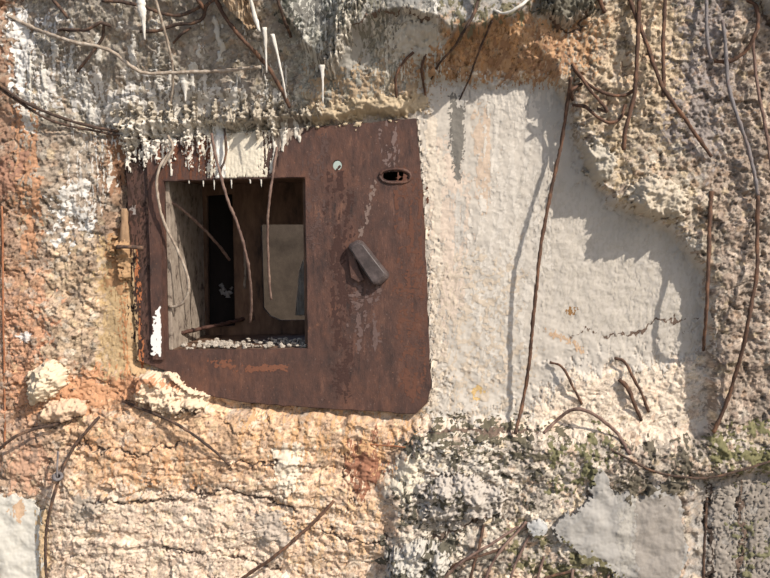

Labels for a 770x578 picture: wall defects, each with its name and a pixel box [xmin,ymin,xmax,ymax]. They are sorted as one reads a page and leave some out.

flaking render [315,0,449,92]
corrosion [0,0,48,266]
corrosion [207,165,420,576]
flaking render [410,0,770,578]
crack [570,314,699,339]
damp [71,493,110,524]
crack [83,459,298,513]
crack [162,546,281,570]
crack [313,526,389,545]
damp [379,413,531,535]
damp [437,519,476,544]
damp [612,490,686,578]